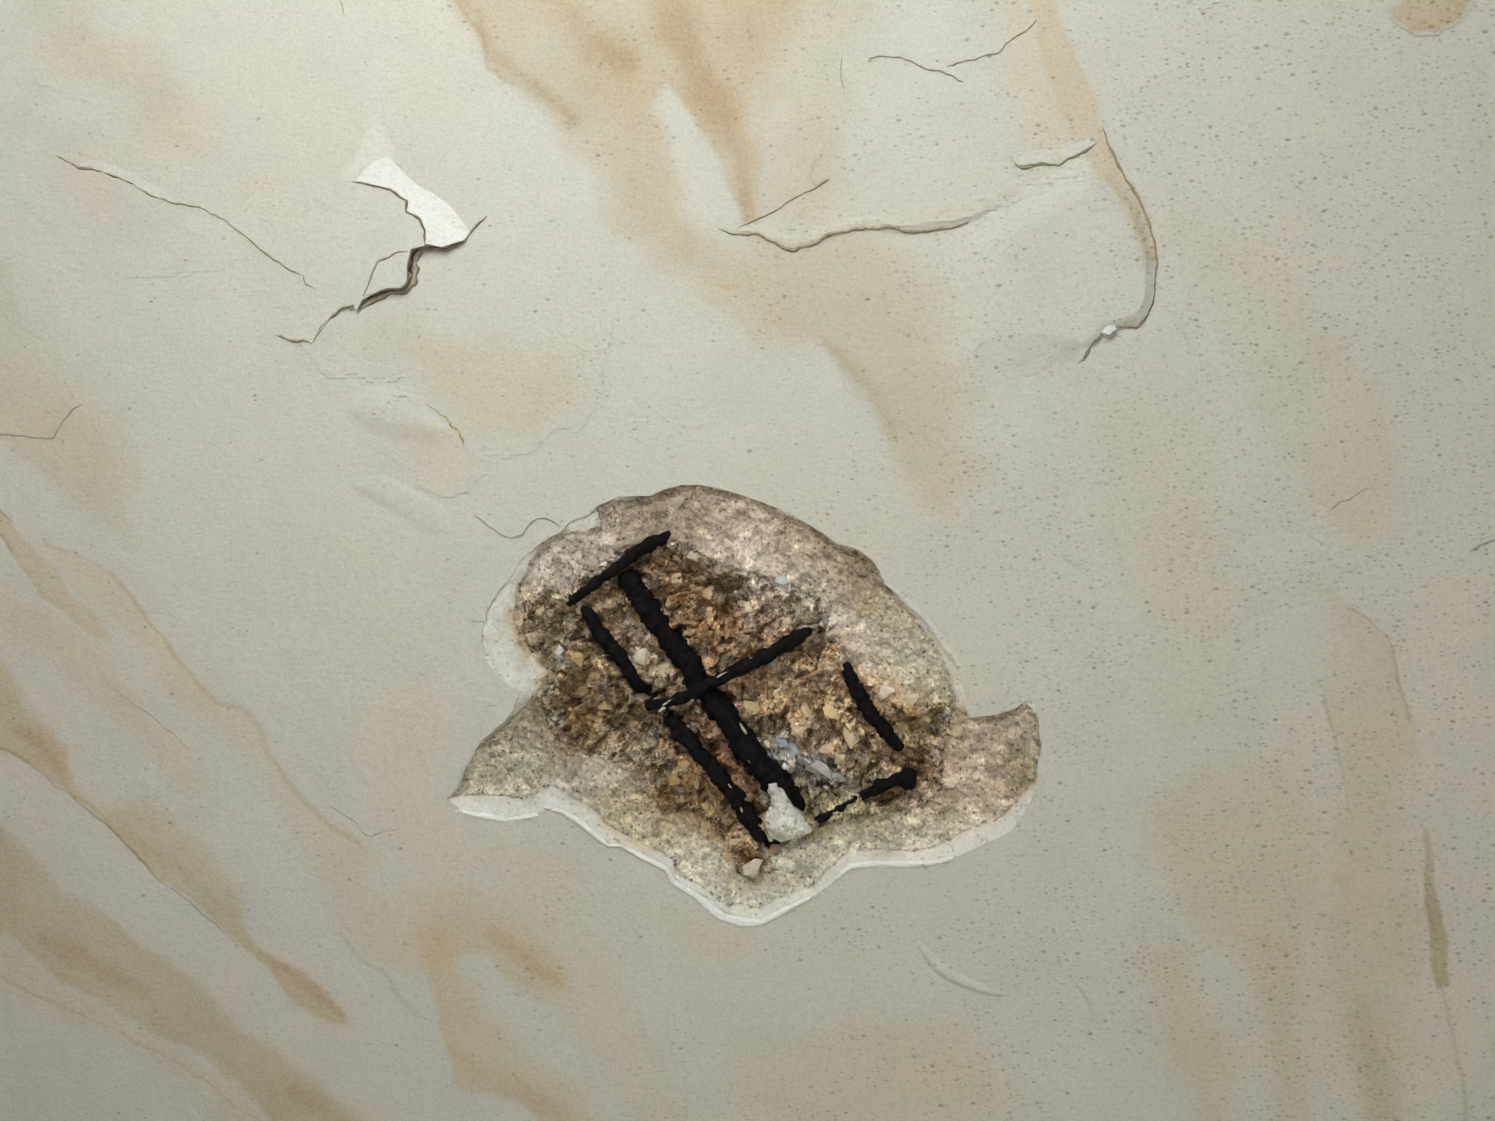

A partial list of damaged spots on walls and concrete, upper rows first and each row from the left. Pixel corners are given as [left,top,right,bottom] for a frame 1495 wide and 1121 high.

crack [840,20,1036,92]
damp [337,110,401,186]
crack [56,155,426,343]
flaking render [226,157,470,343]
crack [719,179,967,252]
crack [1014,127,1158,363]
corrosion [632,553,761,668]
damp [0,243,1026,1121]
corrosion [550,690,696,814]
corrosion [689,706,766,808]
spalling [447,485,1041,928]
corrosion [861,760,937,815]